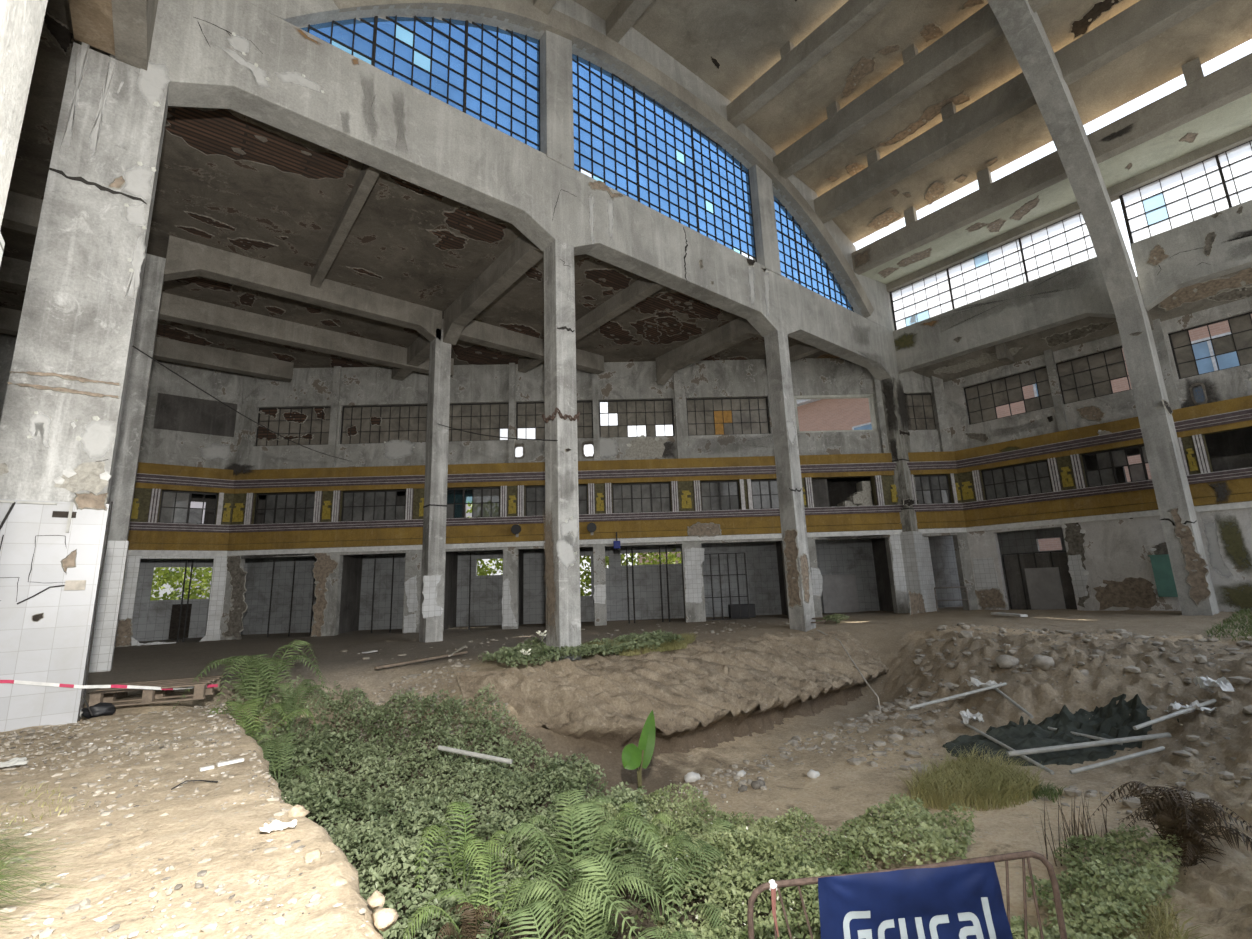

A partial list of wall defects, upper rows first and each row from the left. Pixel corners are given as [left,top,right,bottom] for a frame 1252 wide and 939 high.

spalling [1069,0,1123,39]
spalling [841,44,900,99]
spalling [139,62,351,180]
crack [49,168,147,204]
spalling [382,171,508,251]
spalling [598,290,724,346]
spalling [1158,267,1252,311]
spalling [6,371,121,399]
spalling [223,556,248,640]
spalling [310,553,339,637]
peeling [1061,523,1158,610]
spalling [1150,507,1212,606]